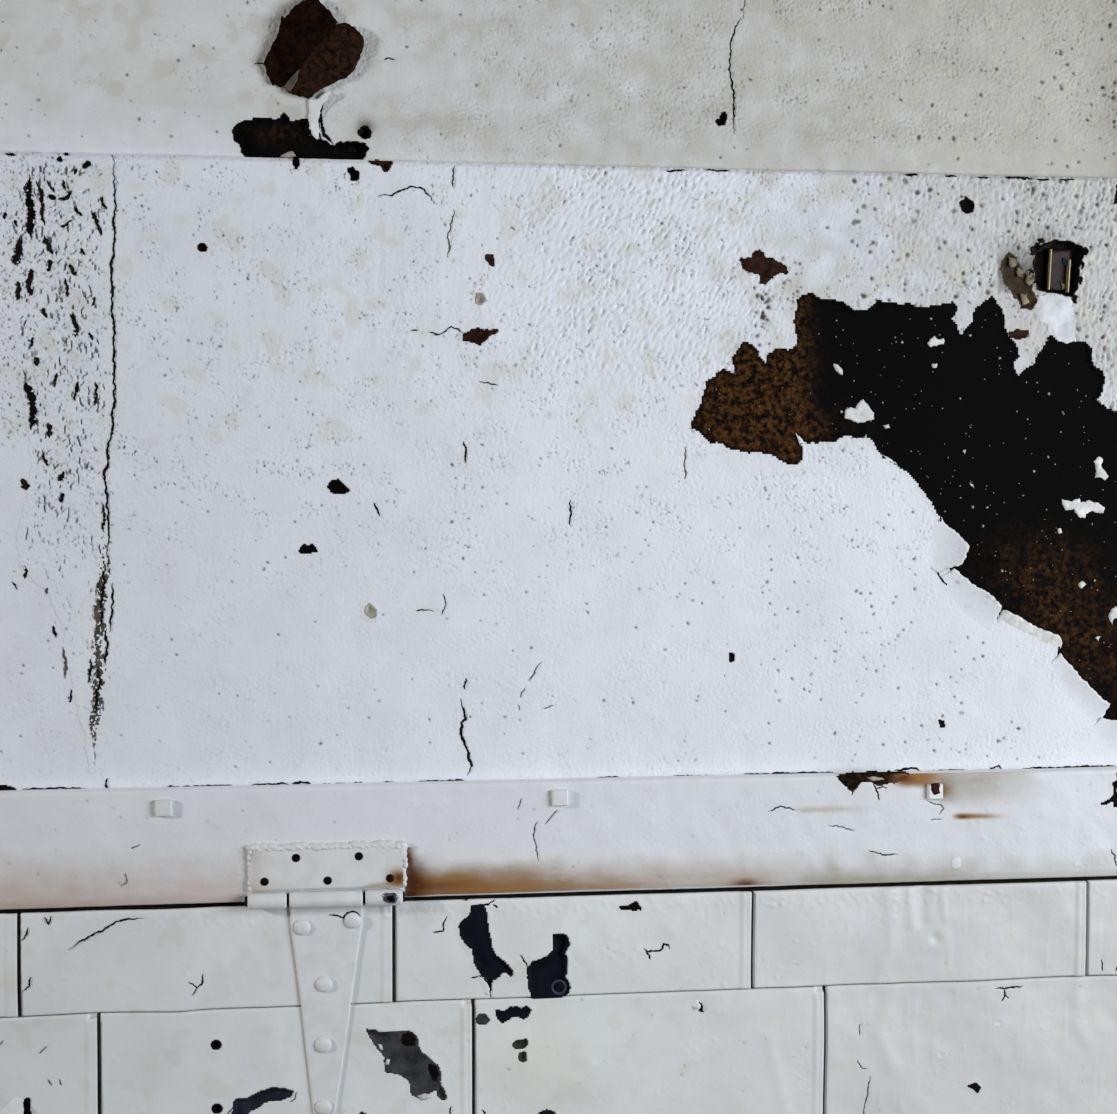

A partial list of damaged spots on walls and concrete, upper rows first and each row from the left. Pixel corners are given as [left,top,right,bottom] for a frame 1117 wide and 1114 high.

peeling [232,0,392,181]
crack [728,3,745,131]
peeling [740,249,789,284]
spalling [1028,237,1089,304]
crack [102,158,117,631]
peeling [691,293,1117,753]
crack [459,678,473,773]
rust [896,773,949,795]
rust [386,847,639,897]
peeling [458,904,513,995]
peeling [475,934,571,1025]
peeling [367,1028,447,1100]